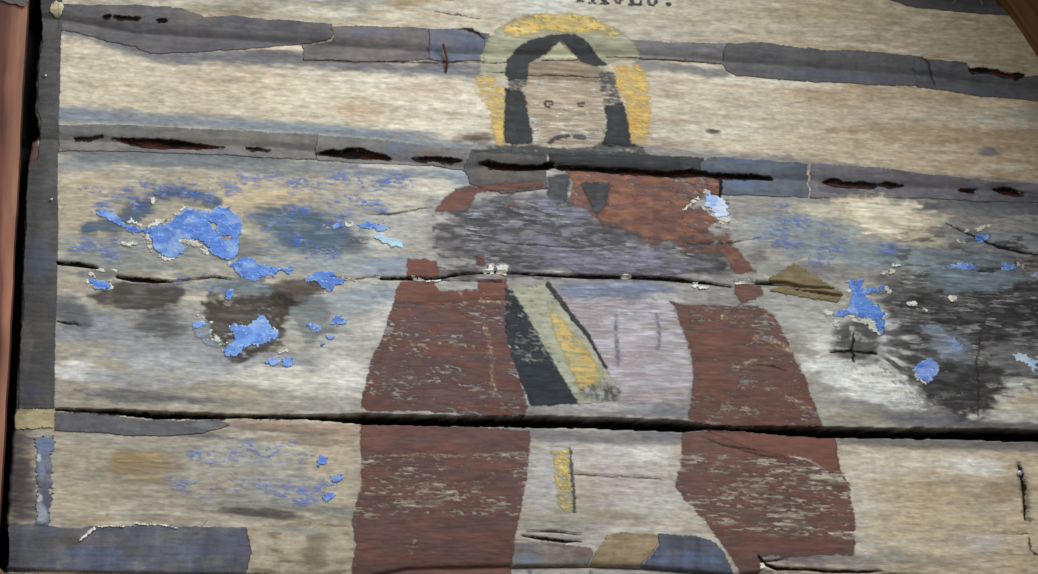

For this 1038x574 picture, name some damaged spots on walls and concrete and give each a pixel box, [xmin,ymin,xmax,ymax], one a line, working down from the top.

peeling [682,189,732,226]
peeling [96,205,294,281]
crack [57,261,227,283]
peeling [305,271,356,293]
crack [339,271,801,289]
peeling [824,263,901,336]
peeling [192,314,279,357]
leakage [890,286,1038,420]
peeling [844,358,963,411]
crack [65,411,209,420]
crack [569,472,660,480]
crack [1017,465,1038,555]